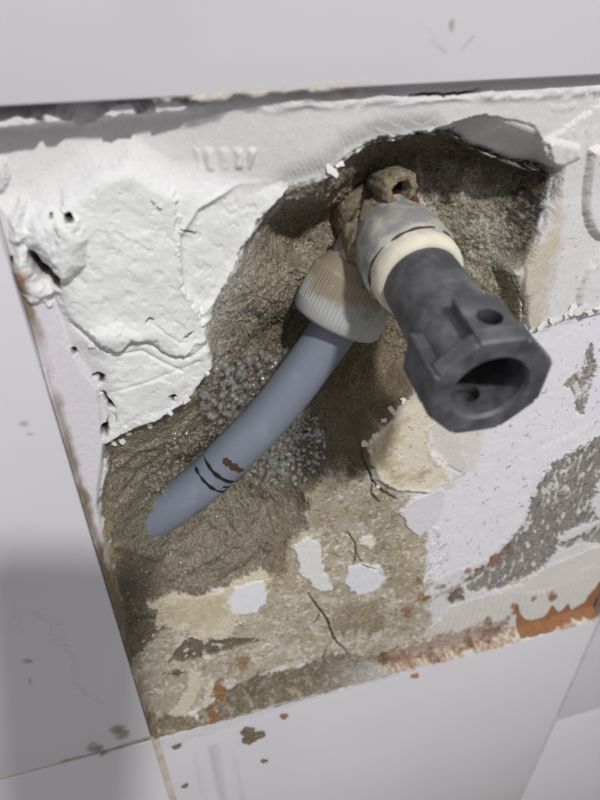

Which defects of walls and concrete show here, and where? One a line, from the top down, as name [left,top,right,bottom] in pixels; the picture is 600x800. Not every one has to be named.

spalling [0,129,600,739]
crack [356,434,394,500]
crack [307,593,347,660]
rust [402,577,431,617]
rust [477,604,519,637]